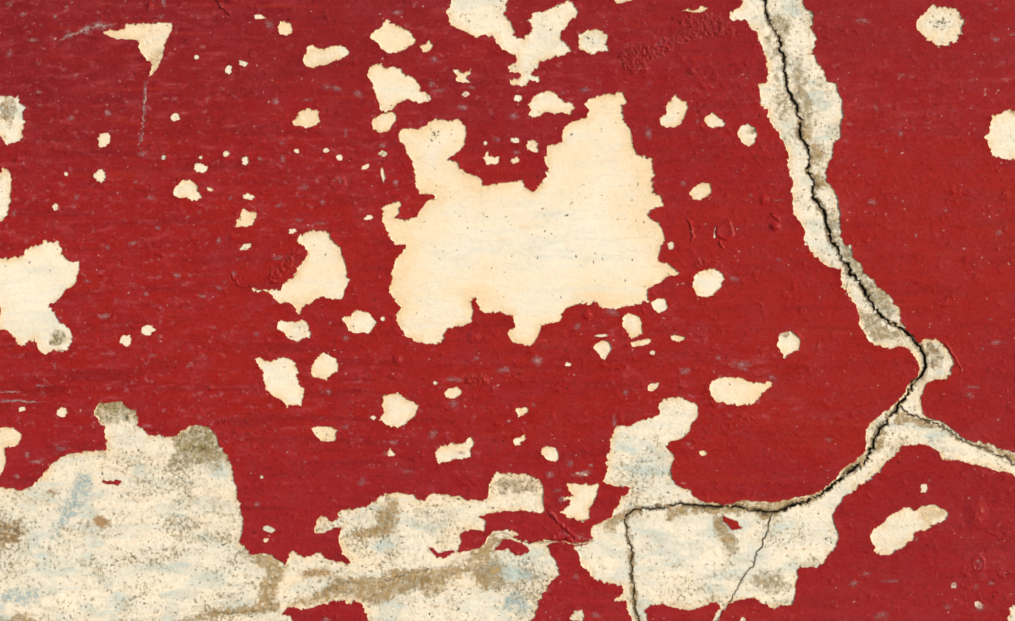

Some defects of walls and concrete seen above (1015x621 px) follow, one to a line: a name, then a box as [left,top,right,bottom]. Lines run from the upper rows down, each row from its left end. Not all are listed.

peeling [103,22,173,76]
peeling [0,95,26,146]
peeling [0,167,12,221]
peeling [342,0,680,355]
peeling [0,239,80,354]
peeling [252,229,351,342]
peeling [574,0,1015,621]
crack [624,0,1015,621]
peeling [370,392,419,428]
peeling [0,401,588,621]
peeling [560,482,599,523]